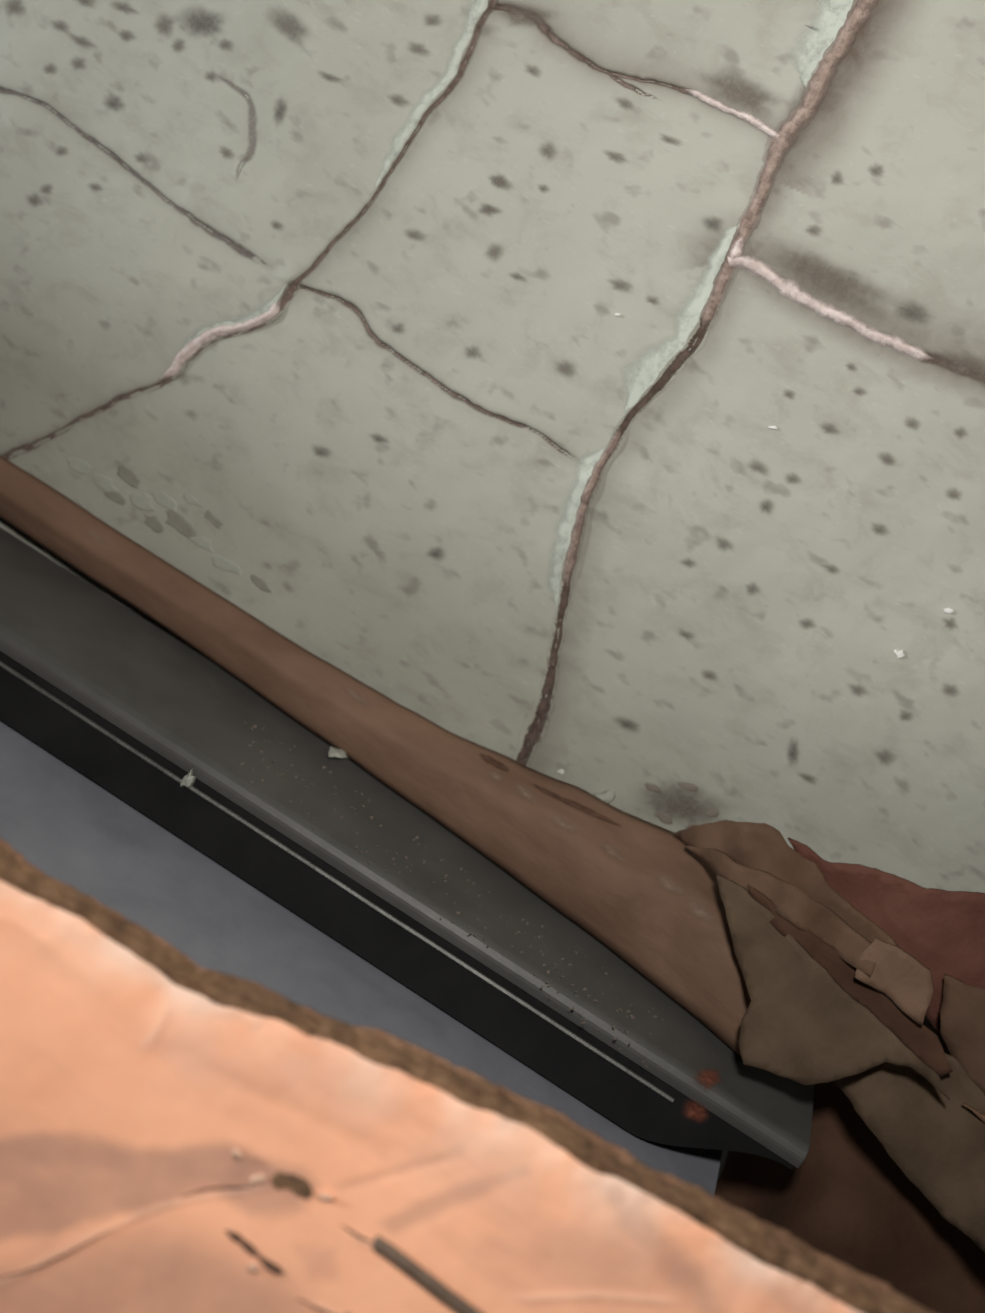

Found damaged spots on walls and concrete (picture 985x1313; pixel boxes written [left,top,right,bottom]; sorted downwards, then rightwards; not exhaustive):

crack [0,0,985,766]